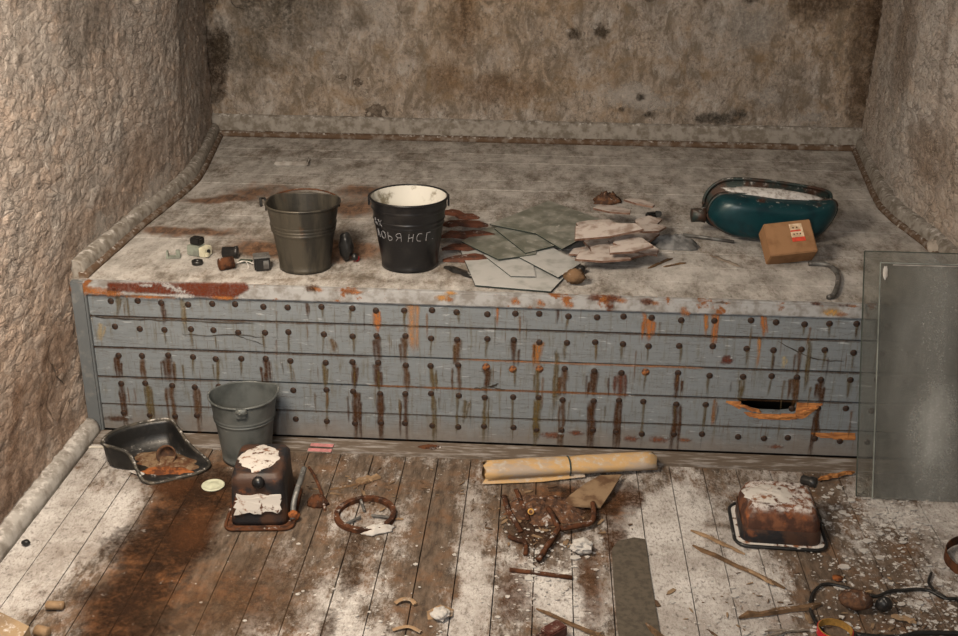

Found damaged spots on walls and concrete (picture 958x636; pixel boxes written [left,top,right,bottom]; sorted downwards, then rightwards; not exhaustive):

damp [206,0,329,99]
corrosion [83,282,248,320]
corrosion [588,294,624,310]
corrosion [98,335,271,422]
corrosion [283,305,455,436]
corrosion [418,341,497,450]
corrosion [509,320,695,450]
corrosion [623,299,825,448]
spalling [726,401,823,420]
damp [79,467,232,636]